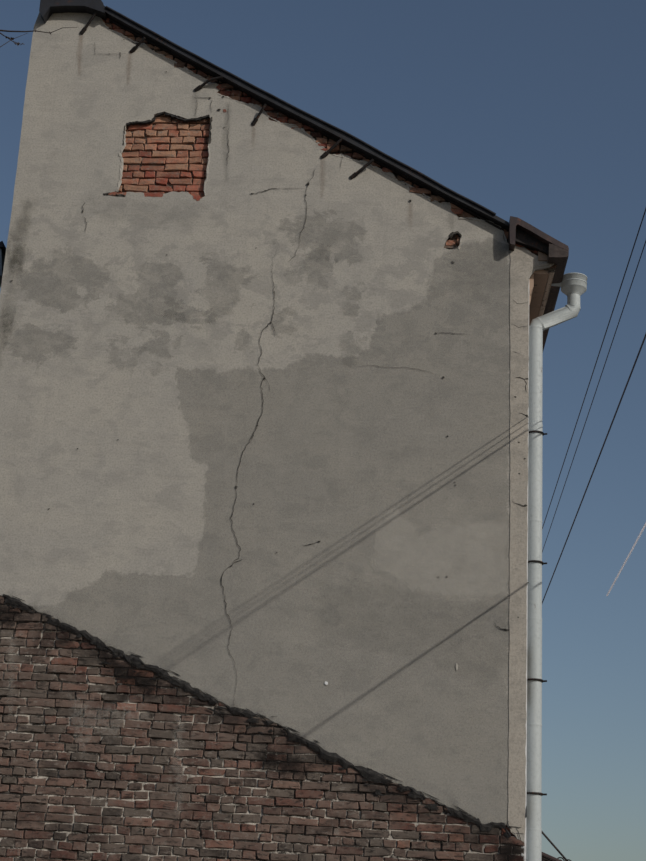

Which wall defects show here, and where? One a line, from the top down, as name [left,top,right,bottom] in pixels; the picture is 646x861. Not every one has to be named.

spalling [100,19,538,254]
crack [221,170,315,702]